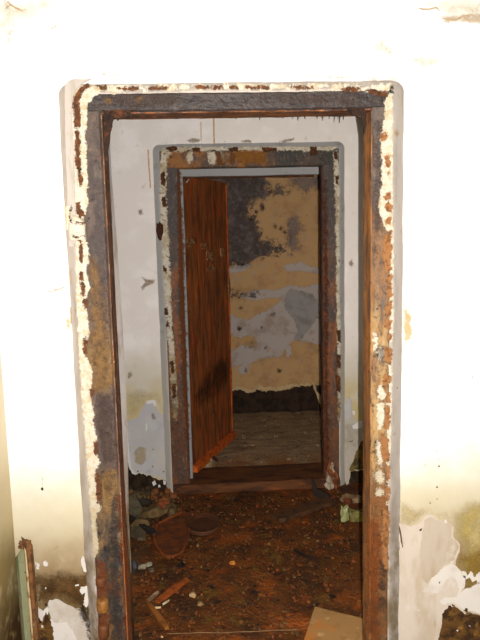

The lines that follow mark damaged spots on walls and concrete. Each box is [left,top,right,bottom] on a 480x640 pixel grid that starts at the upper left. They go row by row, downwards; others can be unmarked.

corrosion [72,83,107,187]
corrosion [103,98,132,176]
corrosion [72,234,112,396]
flaking render [229,263,253,274]
mould [210,175,320,269]
flaking render [230,284,321,375]
corrosion [381,191,394,365]
flaking render [127,400,167,493]
corrosion [373,373,392,570]
spalling [38,584,90,640]
spalling [398,515,480,640]
damp [460,506,480,583]